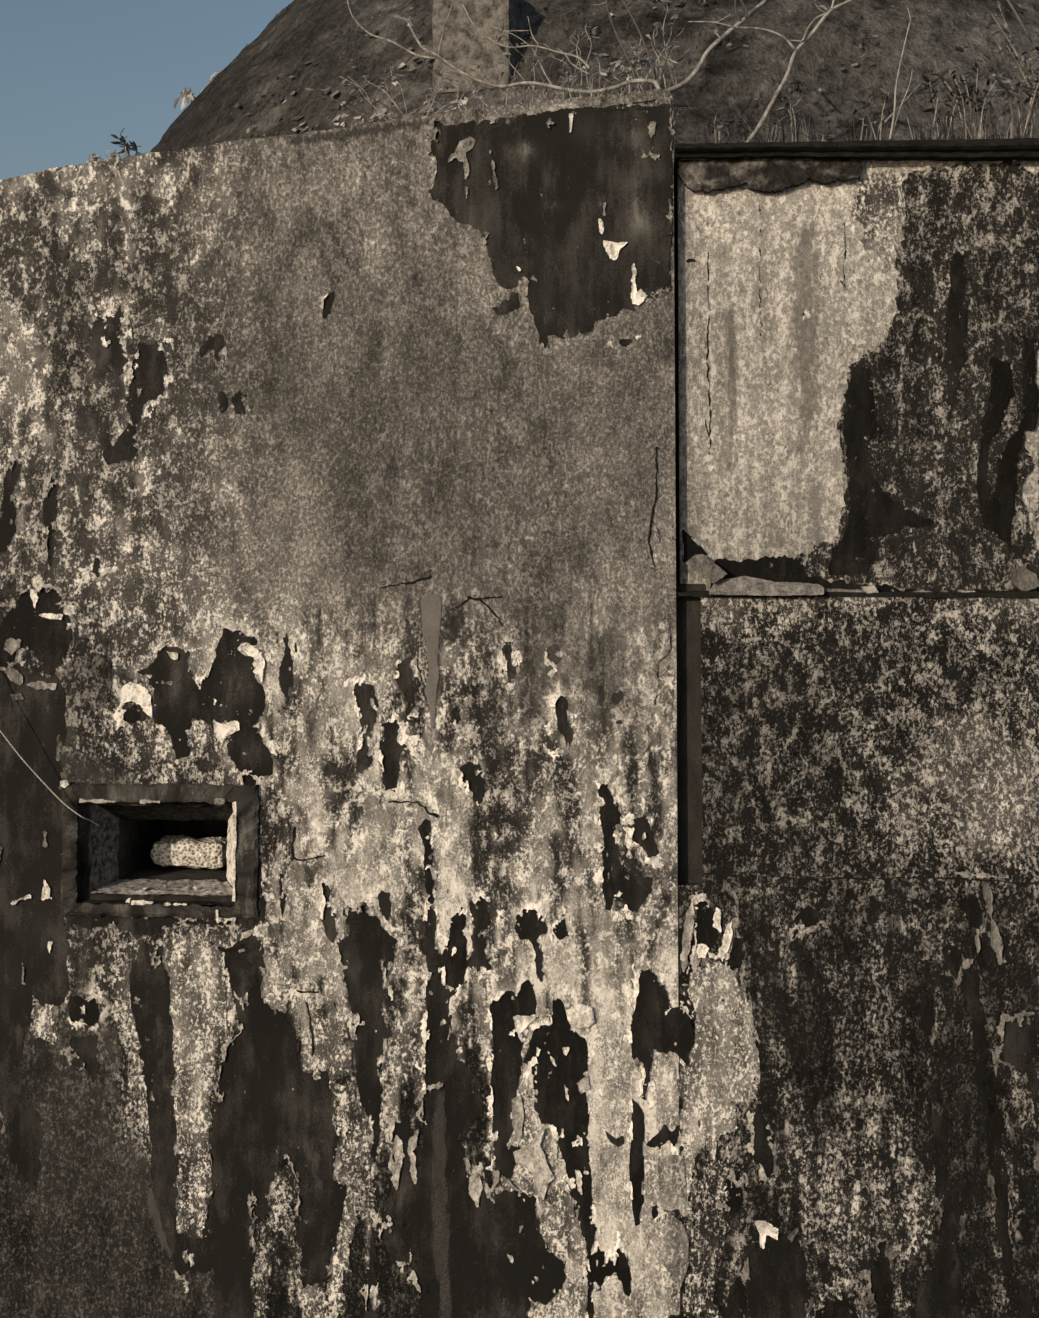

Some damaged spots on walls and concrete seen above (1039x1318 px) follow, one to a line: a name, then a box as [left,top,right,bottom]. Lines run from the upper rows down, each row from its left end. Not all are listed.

peeling [426,100,708,355]
peeling [86,305,174,471]
peeling [938,249,971,418]
peeling [976,336,1039,547]
peeling [0,471,348,1318]
peeling [593,780,662,920]
damp [146,1187,176,1258]
damp [431,1092,452,1318]
peeling [315,819,632,1318]
peeling [605,892,746,1226]
peeling [717,1104,780,1219]
peeling [721,1220,897,1318]